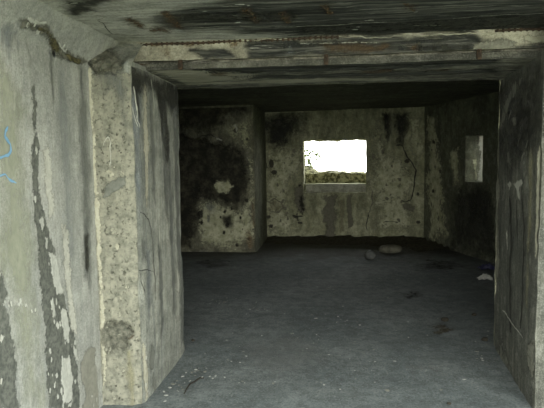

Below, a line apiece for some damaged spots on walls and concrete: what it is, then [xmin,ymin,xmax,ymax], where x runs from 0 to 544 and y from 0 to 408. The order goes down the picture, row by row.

crack [396,144,417,211]
damp [472,136,483,181]
spalling [20,16,148,408]